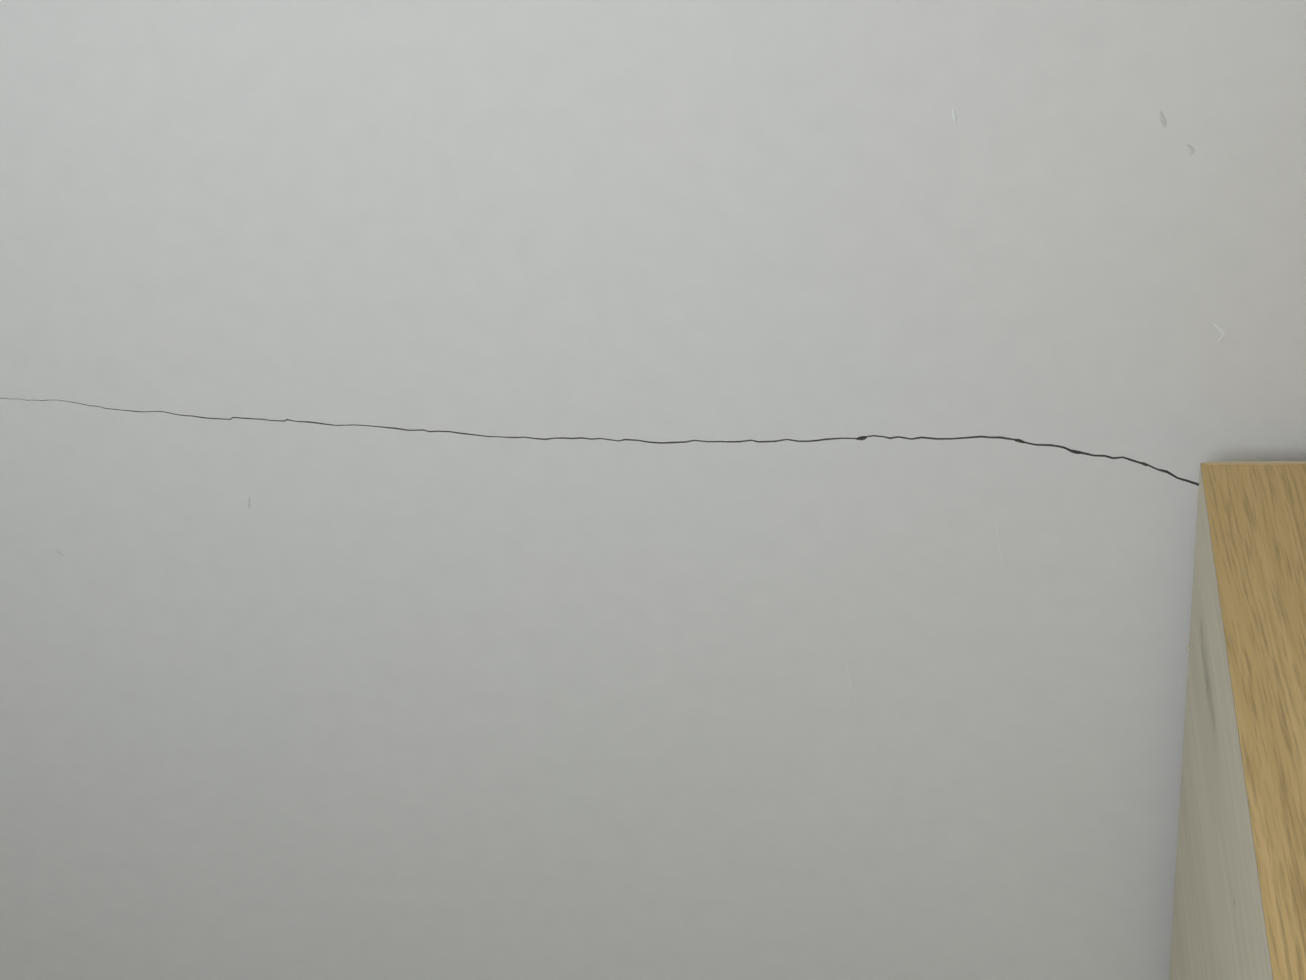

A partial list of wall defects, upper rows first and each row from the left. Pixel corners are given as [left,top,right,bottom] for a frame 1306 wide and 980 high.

crack [0,398,1199,486]